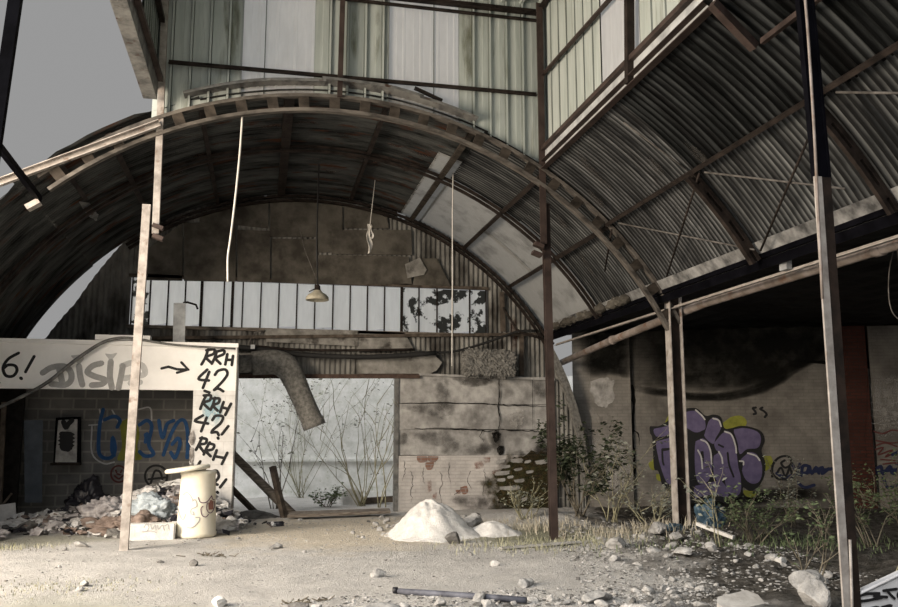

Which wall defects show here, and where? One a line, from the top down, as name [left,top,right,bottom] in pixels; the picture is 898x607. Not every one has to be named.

leakage [583,330,668,396]
leakage [683,326,826,400]
crack [415,380,546,451]
peeling [417,456,438,470]